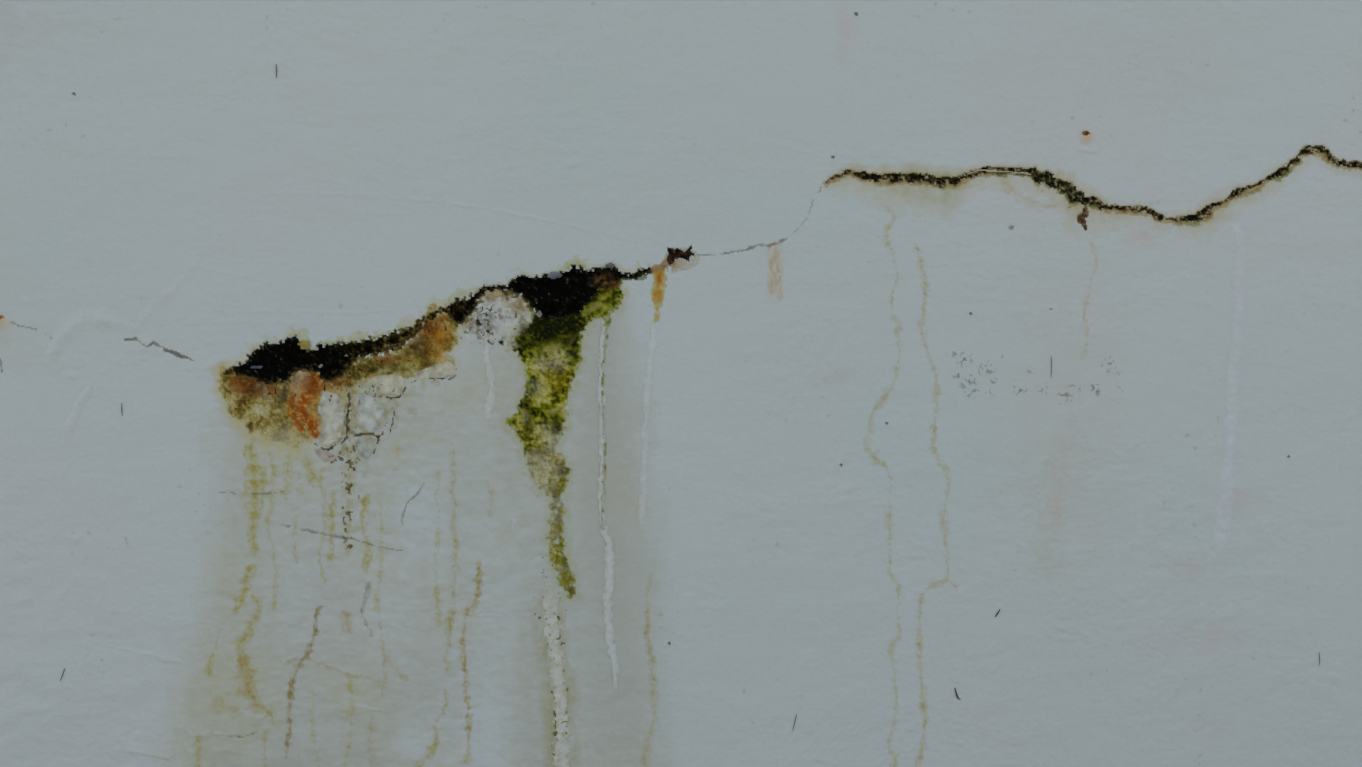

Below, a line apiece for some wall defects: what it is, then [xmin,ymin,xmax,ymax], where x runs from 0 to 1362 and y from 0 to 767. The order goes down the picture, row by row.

corrosion [351,295,466,383]
spalling [463,284,534,352]
corrosion [650,268,668,324]
crack [124,142,1362,403]
corrosion [209,358,336,461]
spalling [311,360,459,477]
water stain [138,280,685,767]
water stain [862,204,1004,767]